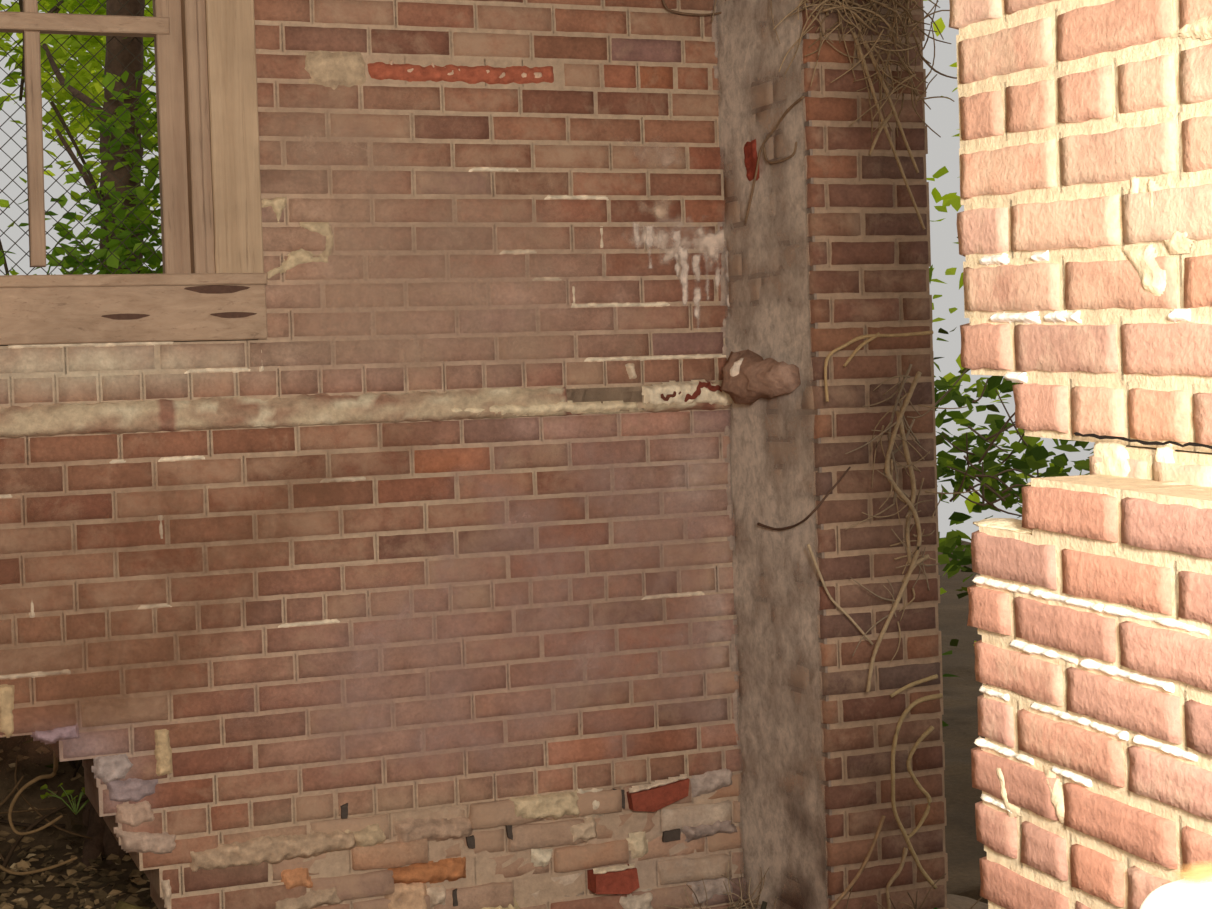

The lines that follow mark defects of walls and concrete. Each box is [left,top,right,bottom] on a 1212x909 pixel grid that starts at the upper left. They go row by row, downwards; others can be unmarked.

water stain [634,206,730,355]
crack [1074,432,1212,449]
spalling [31,723,80,744]
spalling [689,768,733,797]
spalling [91,754,176,854]
spalling [506,788,625,845]
spalling [626,820,738,859]
spalling [190,803,475,909]
spalling [531,848,553,867]
spalling [159,879,172,909]
spalling [618,888,653,909]
spalling [687,877,733,904]